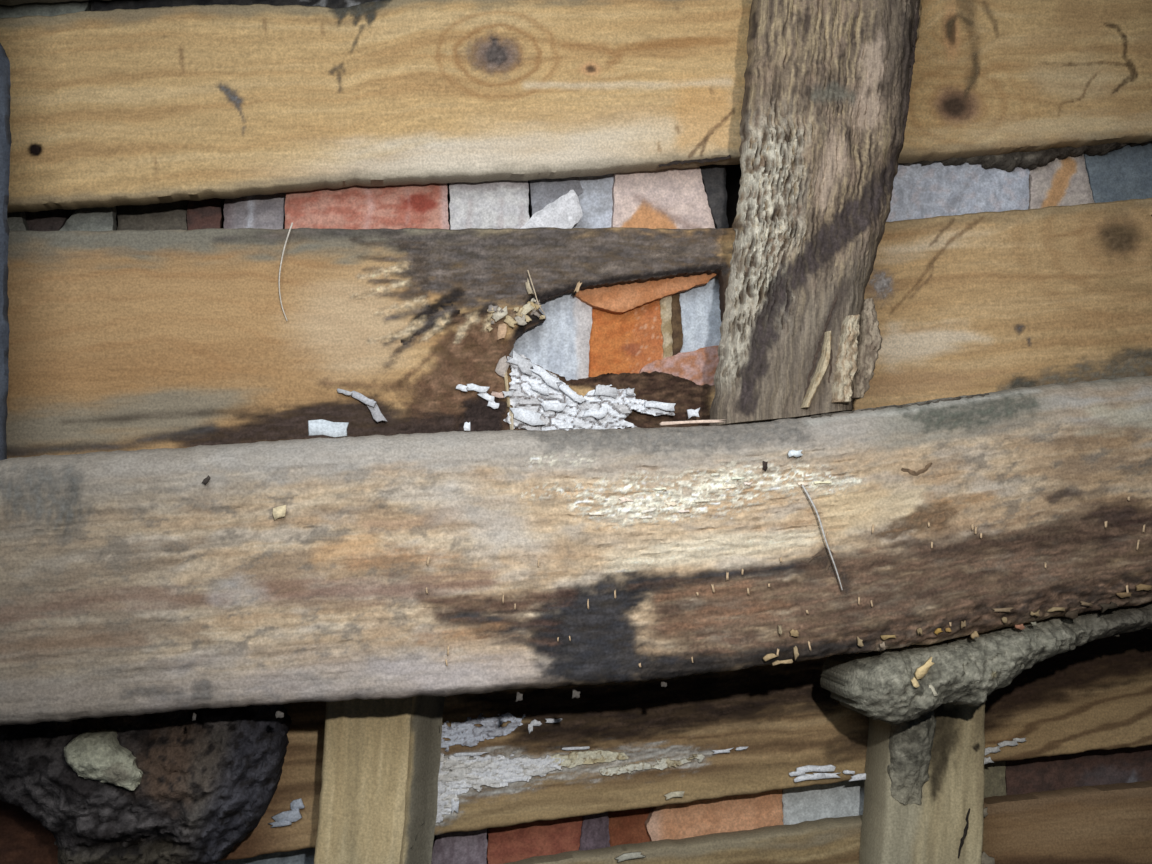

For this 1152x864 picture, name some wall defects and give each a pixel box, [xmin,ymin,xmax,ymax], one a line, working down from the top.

water stain [308,227,731,340]
water stain [7,445,123,456]
water stain [138,396,507,447]
peeling [455,350,700,426]
peeling [525,461,861,528]
water stain [419,500,1152,748]
peeling [441,712,563,757]
peeling [551,746,748,776]